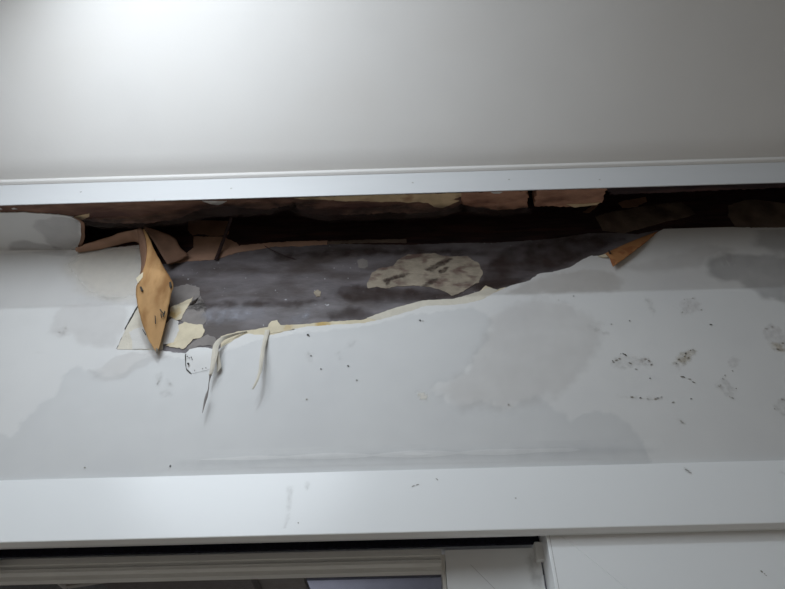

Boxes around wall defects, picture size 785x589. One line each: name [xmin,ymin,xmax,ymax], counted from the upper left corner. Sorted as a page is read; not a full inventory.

peeling [298,193,461,208]
peeling [728,199,785,228]
peeling [160,197,695,353]